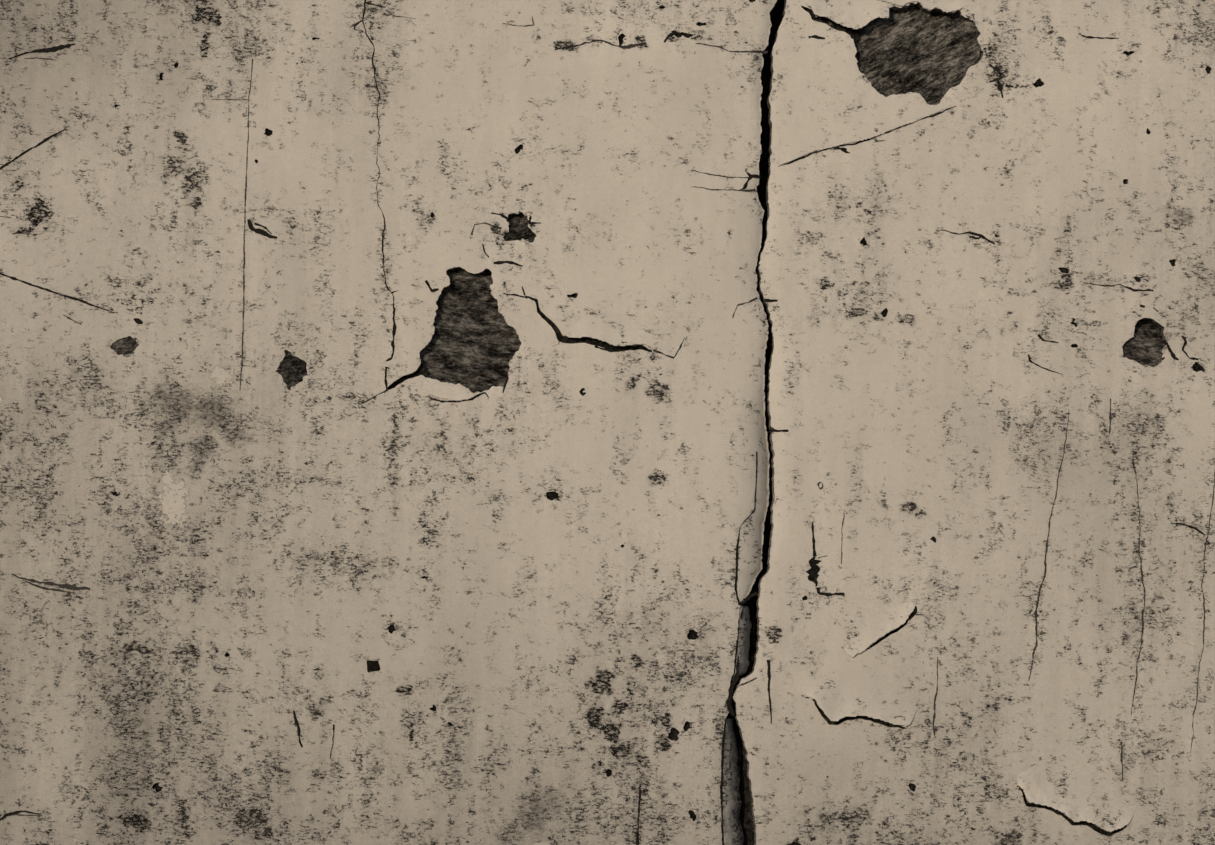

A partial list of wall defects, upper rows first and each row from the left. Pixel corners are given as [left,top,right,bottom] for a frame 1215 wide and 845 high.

spalling [804,0,1013,105]
spalling [420,213,540,403]
crack [504,286,685,359]
spalling [1122,304,1204,372]
crack [555,0,956,845]
peeling [791,602,918,729]
peeling [1017,761,1136,836]